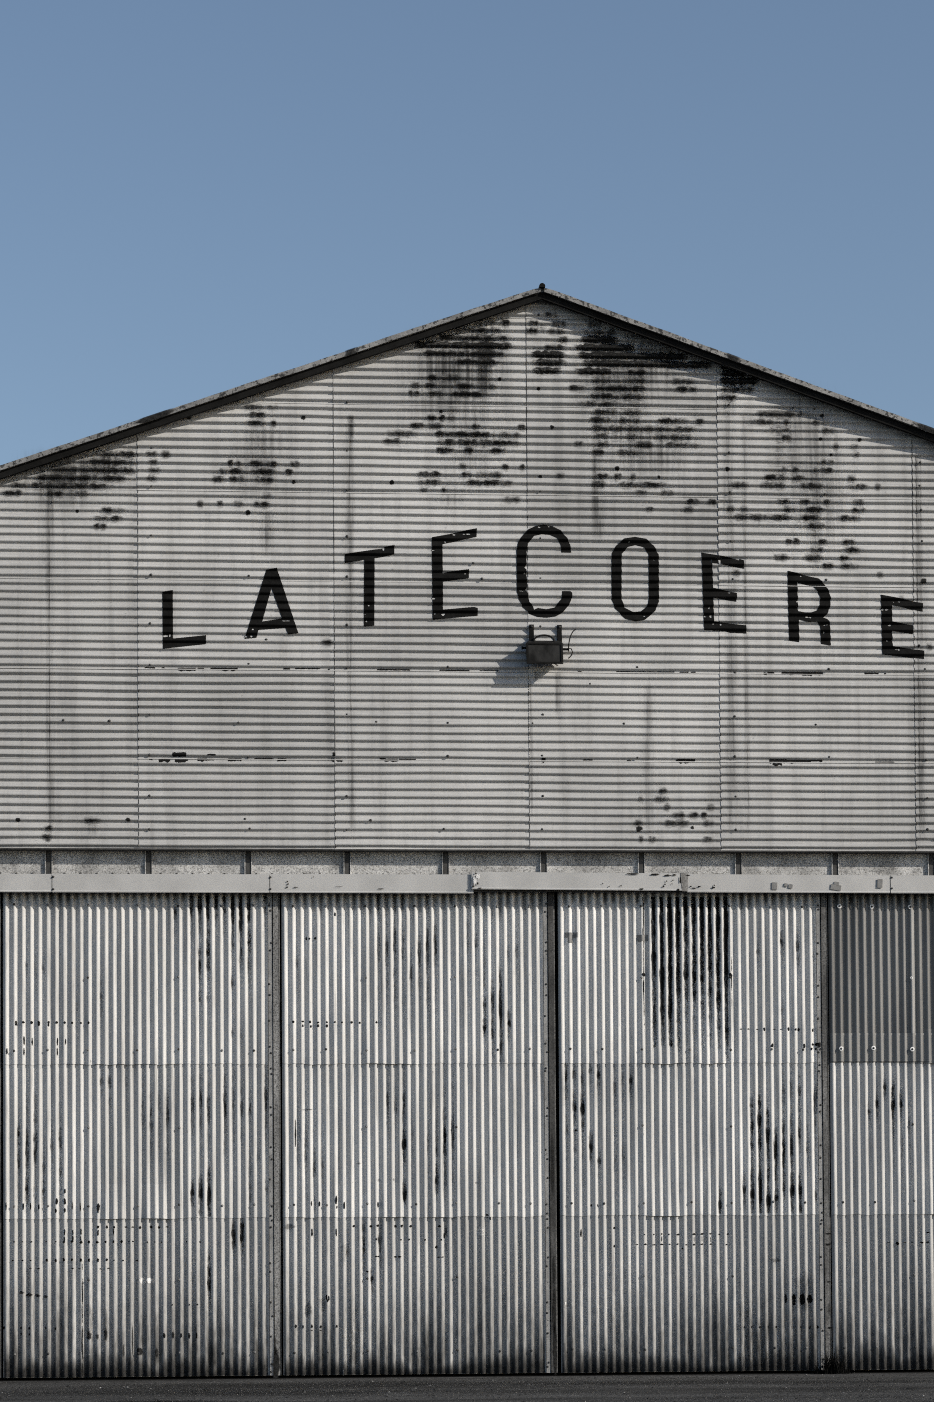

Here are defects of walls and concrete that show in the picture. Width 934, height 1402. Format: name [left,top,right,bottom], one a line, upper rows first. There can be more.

water stain [478,347,488,391]
rust [651,897,729,1047]
rust [742,1085,817,1213]